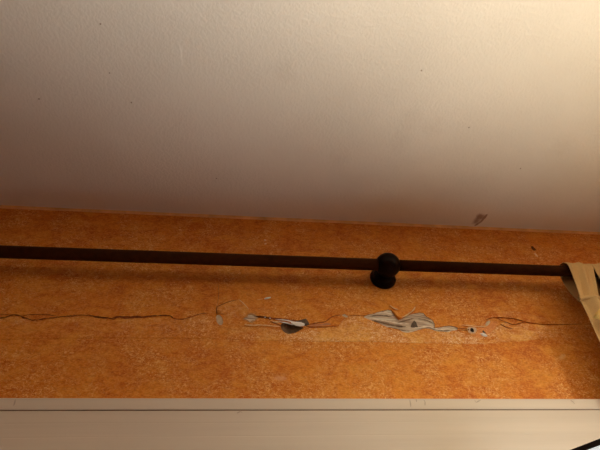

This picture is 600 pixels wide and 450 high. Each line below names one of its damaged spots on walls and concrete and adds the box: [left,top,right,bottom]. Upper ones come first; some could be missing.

crack [0,313,204,321]
spalling [276,319,309,334]
crack [244,315,365,328]
peeling [364,305,500,342]
crack [486,317,573,329]